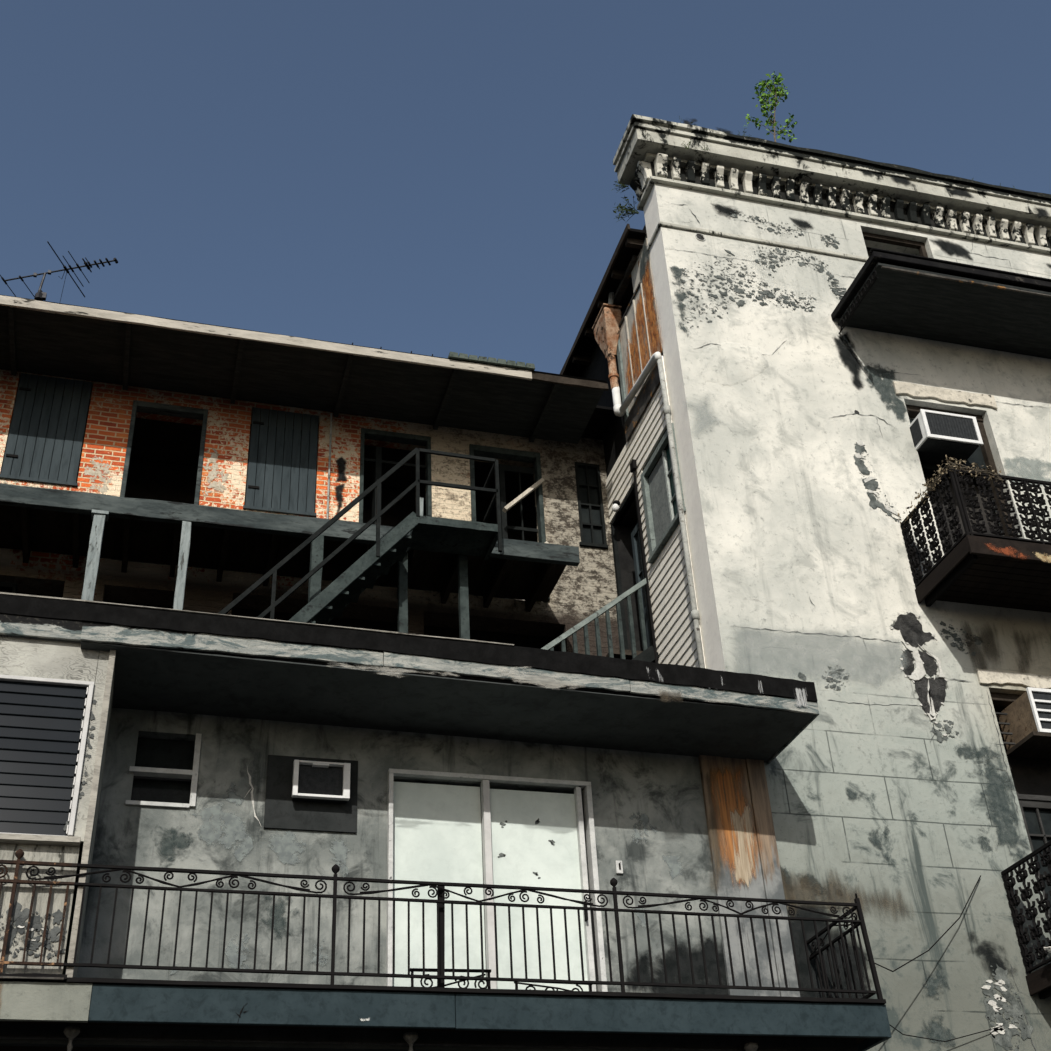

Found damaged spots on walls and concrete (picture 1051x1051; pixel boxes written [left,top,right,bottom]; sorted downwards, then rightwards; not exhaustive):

peeling [679,211,847,328]
corrosion [626,269,661,394]
leakage [834,333,907,420]
peeling [77,455,112,494]
spalling [853,440,901,521]
corrosion [987,543,1026,558]
peeling [502,667,580,688]
spalling [889,612,982,742]
leakage [158,828,192,868]
crack [244,766,261,825]
corrosion [711,768,757,886]
leakage [957,744,1028,859]